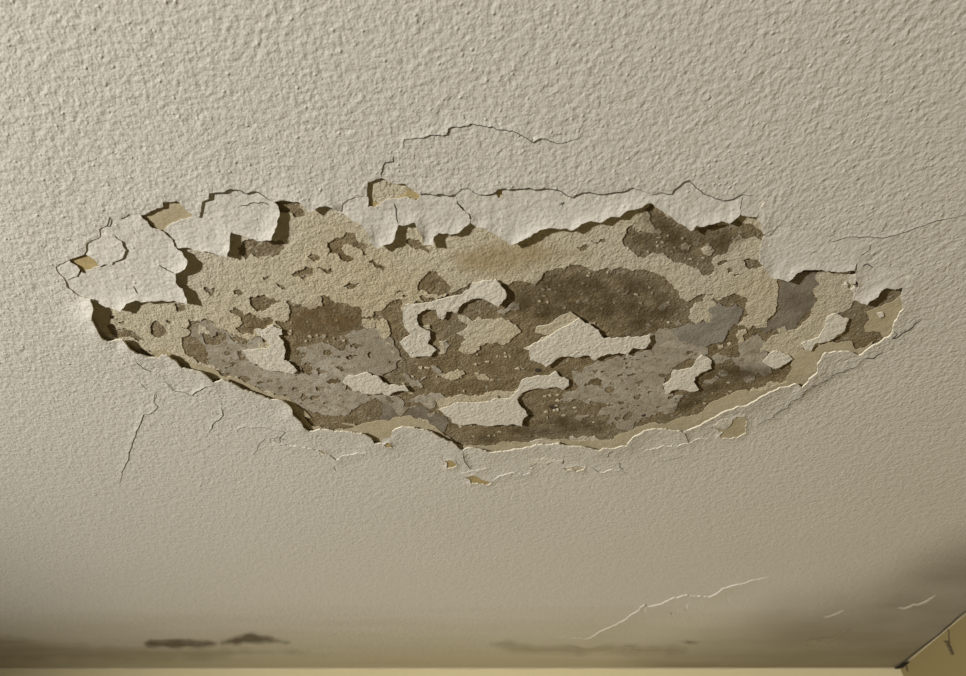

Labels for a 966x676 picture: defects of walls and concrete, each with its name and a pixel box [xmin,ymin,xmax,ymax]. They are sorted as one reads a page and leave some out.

crack [380,112,581,183]
peeling [56,178,907,490]
crack [114,363,371,484]